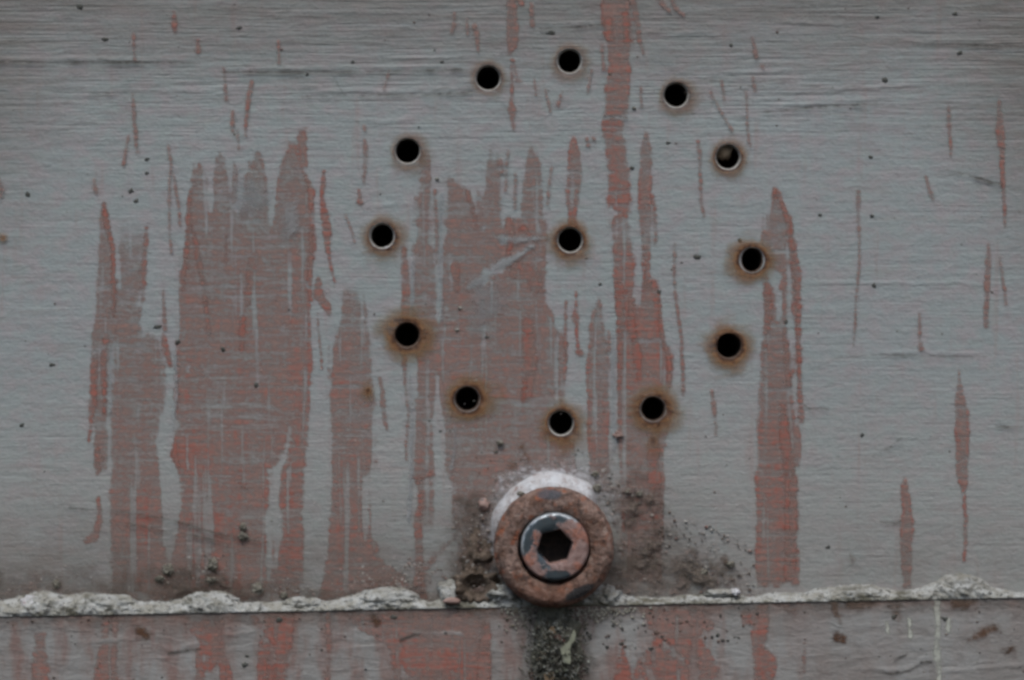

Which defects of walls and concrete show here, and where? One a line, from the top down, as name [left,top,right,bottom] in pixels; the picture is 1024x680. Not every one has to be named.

rust [729,241,772,281]
peeling [84,0,685,680]
rust [381,311,432,356]
rust [707,325,750,369]
rust [632,387,678,442]
peeling [754,187,804,587]